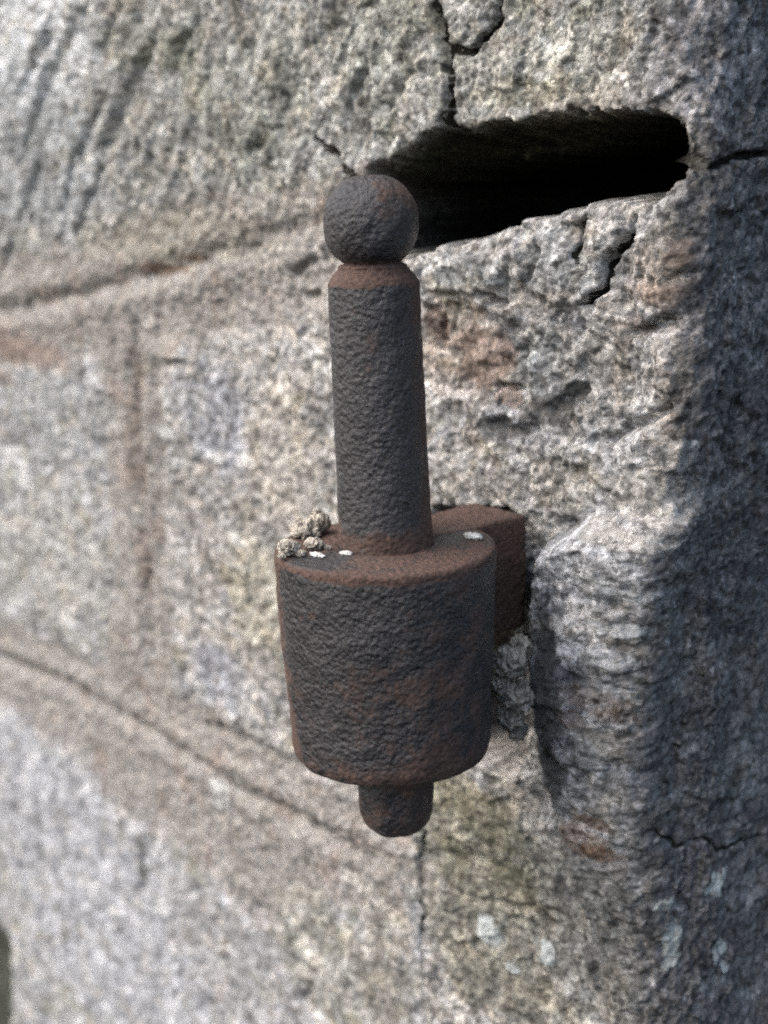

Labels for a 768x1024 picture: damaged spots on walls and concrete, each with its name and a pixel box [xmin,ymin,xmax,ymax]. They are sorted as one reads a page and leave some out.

crack [432,0,505,141]
spalling [364,105,713,258]
crack [708,150,766,170]
crack [655,829,763,852]